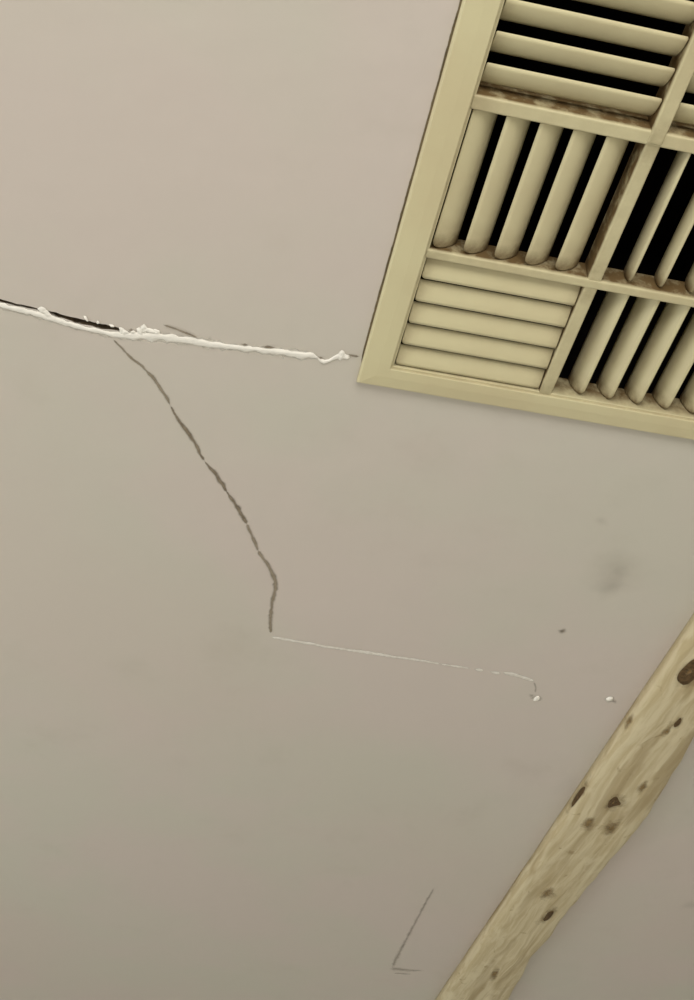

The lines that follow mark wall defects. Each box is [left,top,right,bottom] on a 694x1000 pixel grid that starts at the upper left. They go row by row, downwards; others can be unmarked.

crack [0,299,534,682]